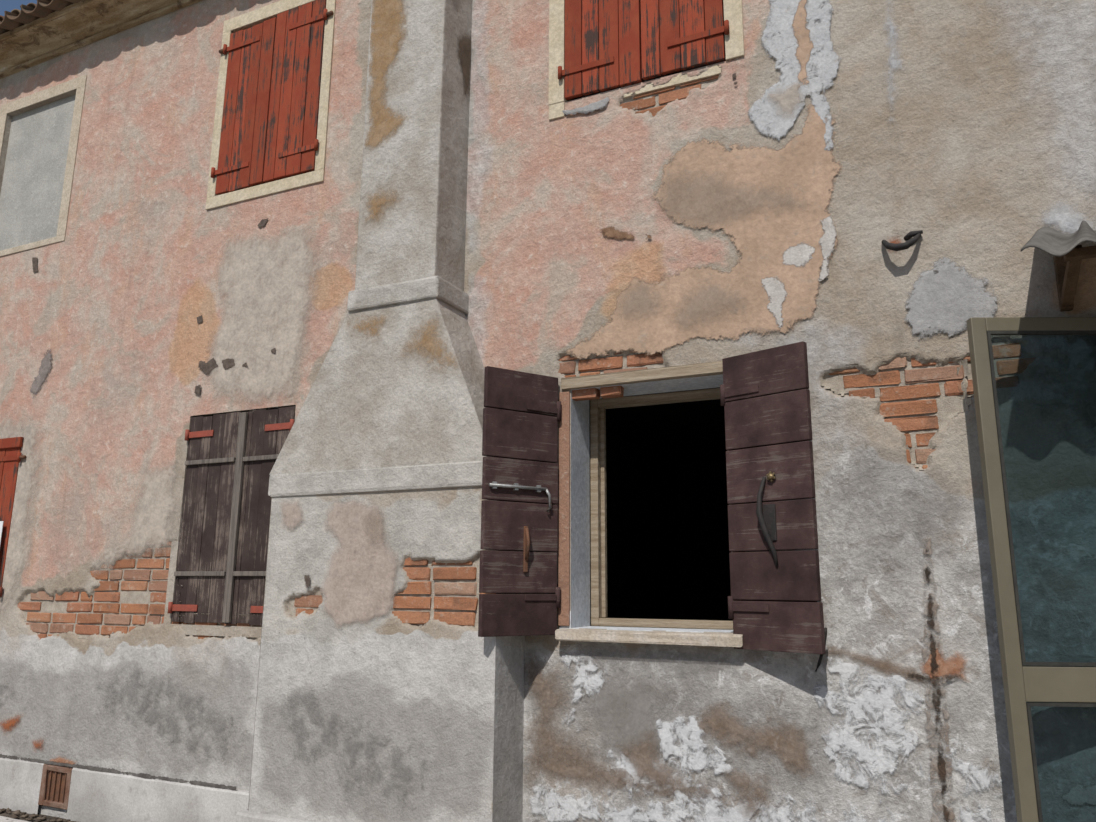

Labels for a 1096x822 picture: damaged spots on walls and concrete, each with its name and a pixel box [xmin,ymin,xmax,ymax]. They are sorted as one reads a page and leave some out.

flaking render [558,0,842,401]
flaking render [820,352,974,470]
flaking render [991,336,1043,388]
flaking render [0,419,262,641]
flaking render [284,588,323,617]
flaking render [391,551,501,629]
leakage [560,645,608,723]
crack [908,537,960,822]
leakage [529,716,826,822]
leakage [814,657,925,822]
leakage [941,748,1002,822]